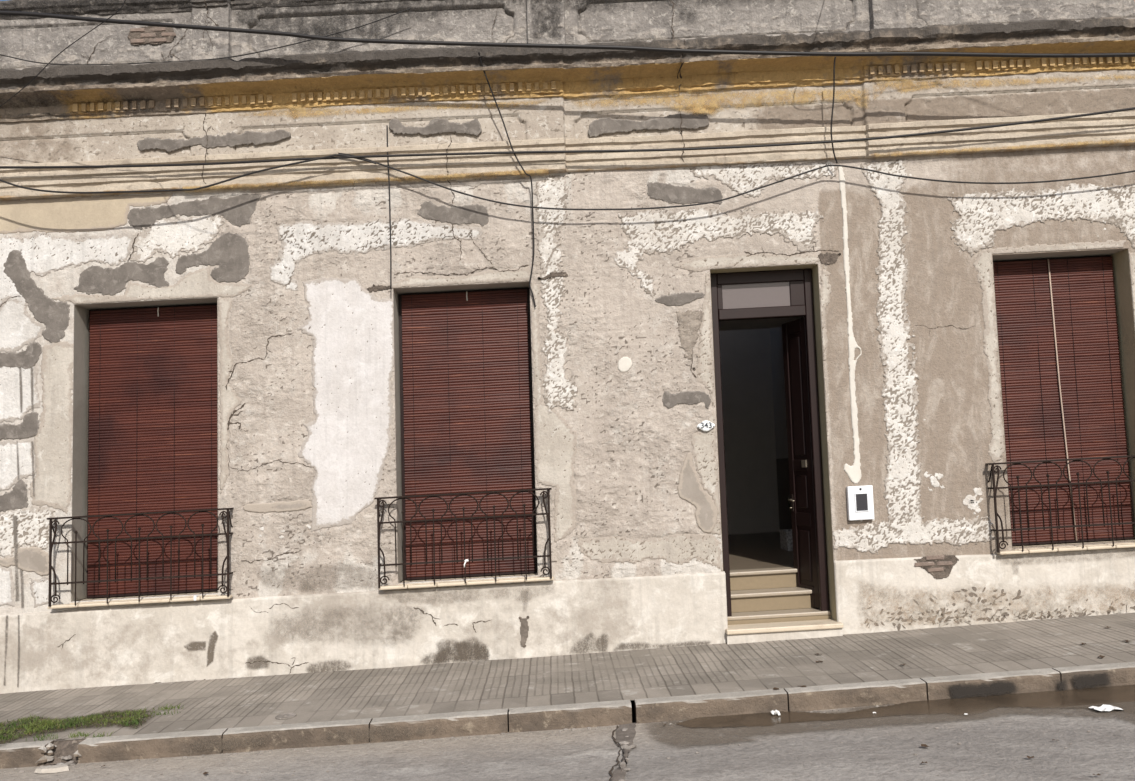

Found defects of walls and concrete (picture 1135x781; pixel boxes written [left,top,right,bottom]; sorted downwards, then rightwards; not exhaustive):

spalling [538,271,568,280]
spalling [367,284,390,292]
crack [225,333,310,475]
spalling [914,555,959,579]
peeling [864,587,1135,631]